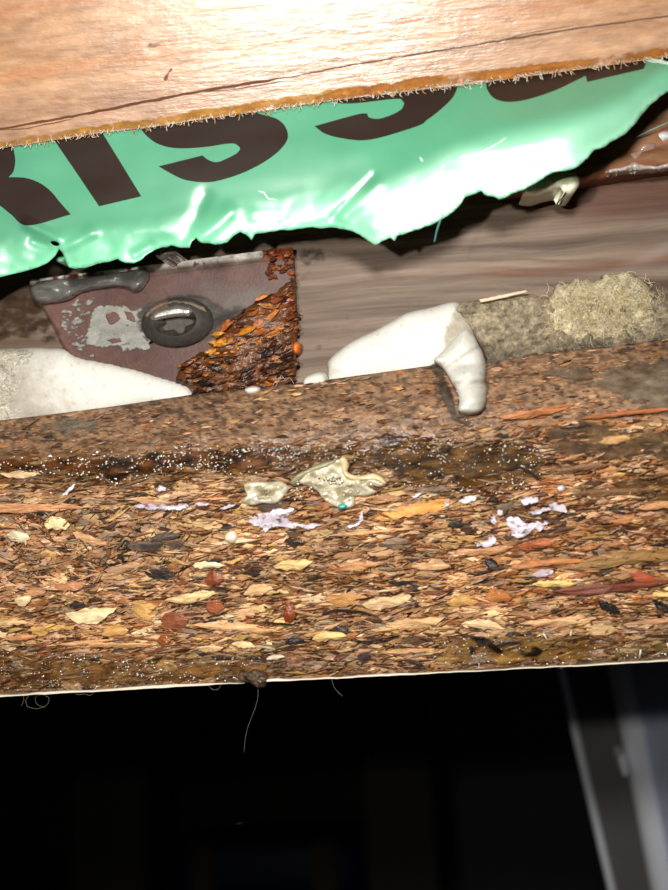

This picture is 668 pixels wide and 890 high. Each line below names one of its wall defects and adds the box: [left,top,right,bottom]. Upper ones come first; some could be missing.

crack [0,15,668,130]
rust [175,248,303,395]
damp [2,450,284,483]
damp [360,446,541,485]